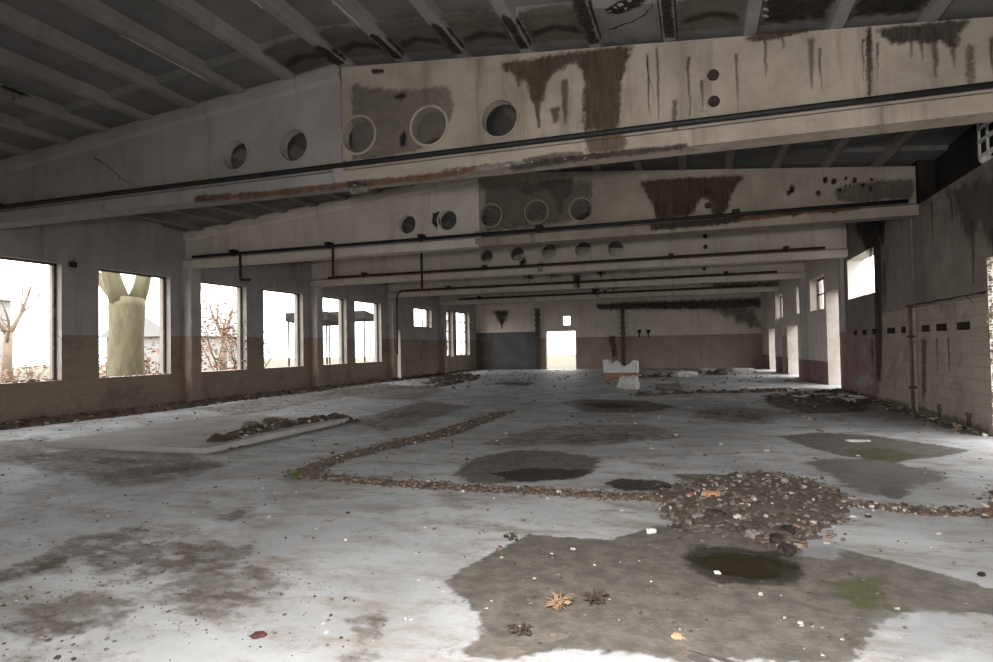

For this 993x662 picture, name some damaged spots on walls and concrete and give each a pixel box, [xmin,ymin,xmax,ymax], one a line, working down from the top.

crack [609,1,655,30]
leakage [748,0,834,59]
leakage [851,0,968,95]
leakage [263,0,687,171]
leakage [485,179,592,230]